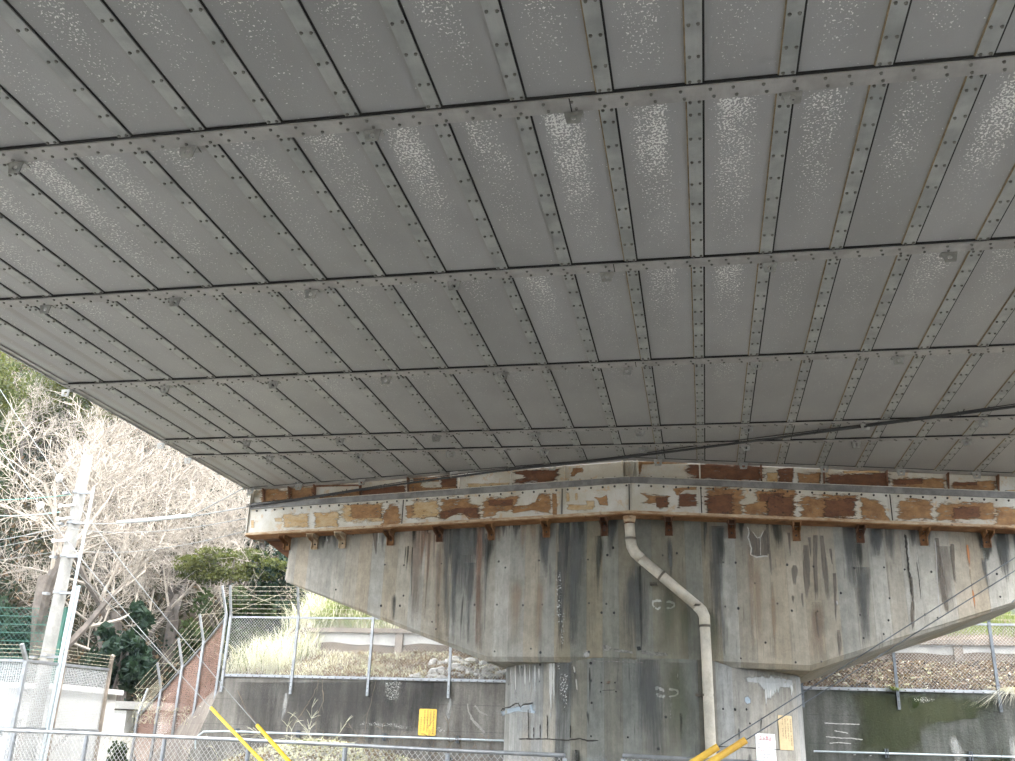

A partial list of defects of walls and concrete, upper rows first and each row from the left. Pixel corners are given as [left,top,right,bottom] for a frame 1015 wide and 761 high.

corrosion [260,468,608,609]
damp [443,527,493,624]
damp [539,522,584,644]
damp [596,520,617,580]
damp [627,566,643,638]
damp [704,522,724,630]
damp [766,524,791,571]
damp [792,535,841,656]
corrosion [638,461,1015,525]
damp [842,527,893,630]
damp [928,533,956,612]
damp [978,533,1015,583]